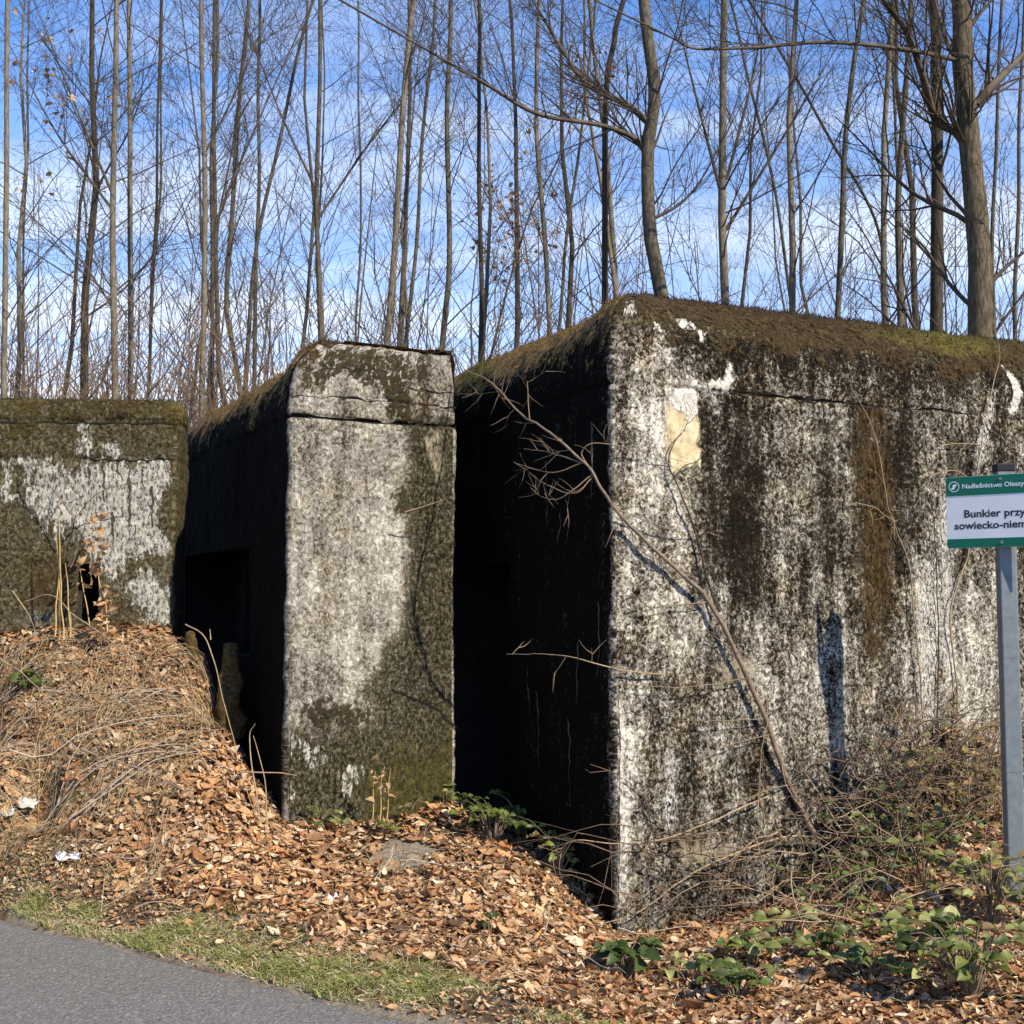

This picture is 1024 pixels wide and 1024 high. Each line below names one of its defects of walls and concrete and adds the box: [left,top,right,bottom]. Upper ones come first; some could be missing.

crack [291,367,457,428]
peeling [665,363,734,473]
crack [711,389,1024,423]
leakage [948,392,996,477]
leakage [88,460,154,550]
leakage [698,405,763,609]
leakage [810,420,840,603]
leakage [289,409,453,828]
leakage [892,411,967,732]